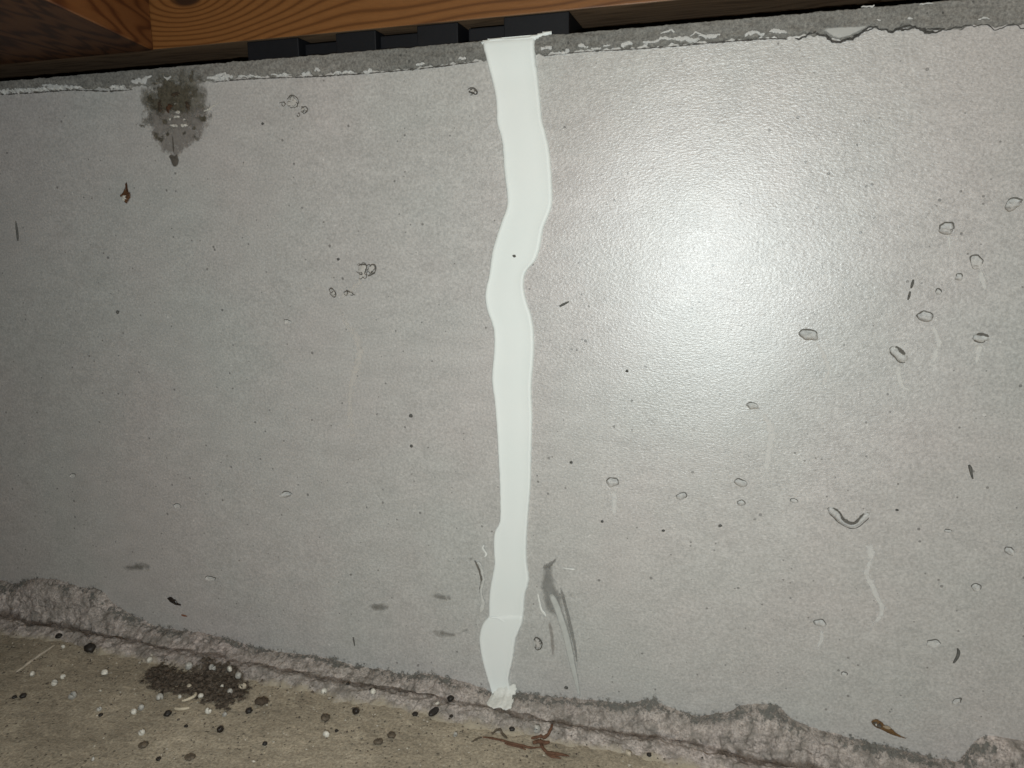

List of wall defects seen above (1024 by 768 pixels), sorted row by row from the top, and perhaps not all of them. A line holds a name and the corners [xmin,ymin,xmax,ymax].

peeling [541,29,720,54]
peeling [745,28,787,37]
peeling [825,26,866,38]
leakage [140,71,219,166]
leakage [550,591,580,695]